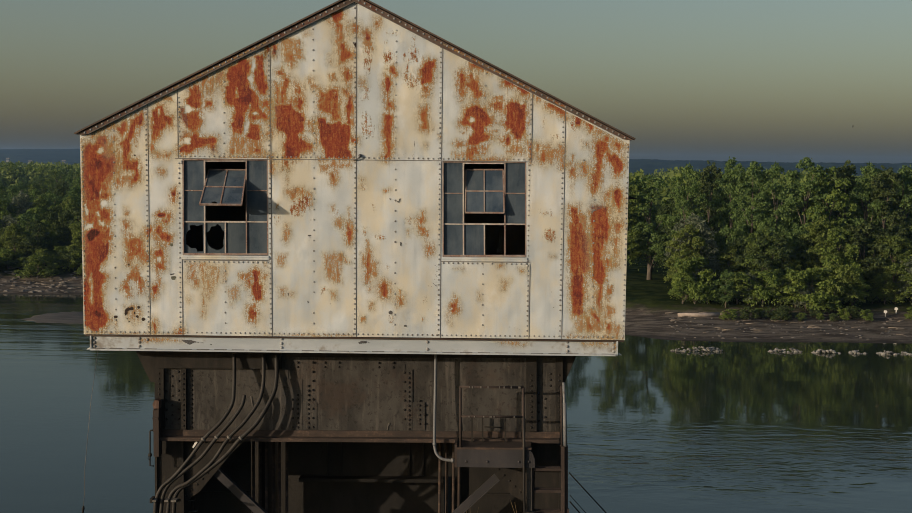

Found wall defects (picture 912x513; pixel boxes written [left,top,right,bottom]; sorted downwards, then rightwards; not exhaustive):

rust [80,8,437,335]
rust [447,46,629,340]